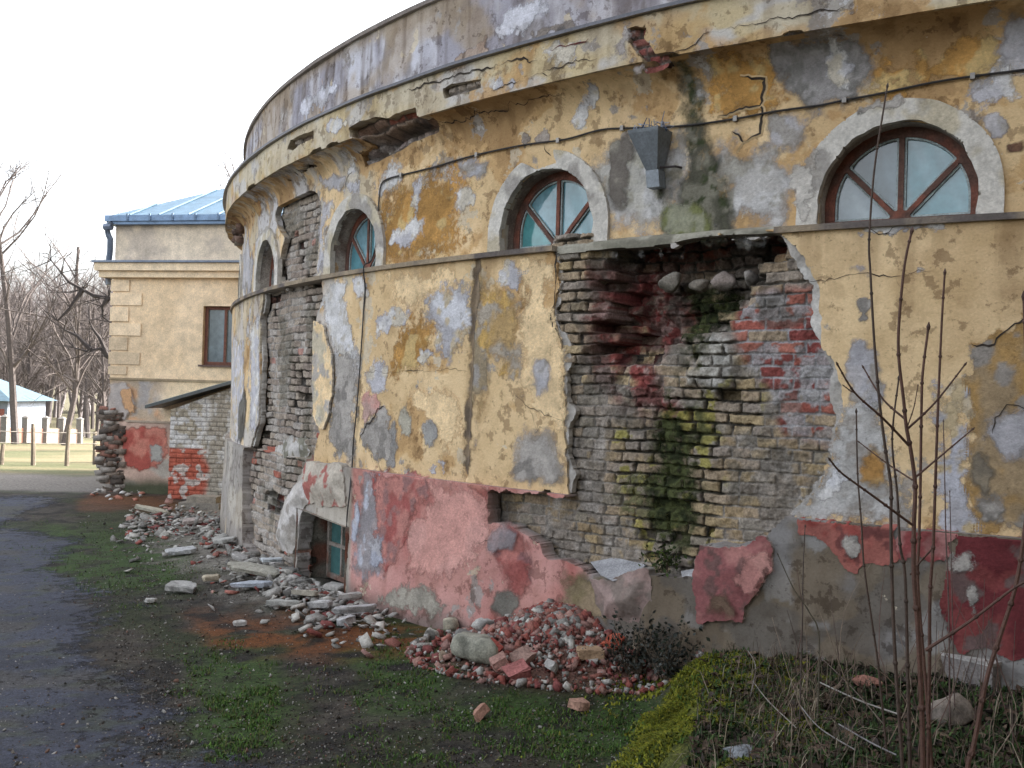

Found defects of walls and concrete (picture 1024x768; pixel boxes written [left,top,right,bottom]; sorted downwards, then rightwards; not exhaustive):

spalling [300,81,440,249]
crack [407,39,596,124]
spalling [616,25,671,74]
leakage [592,61,805,244]
crack [717,74,768,153]
crack [806,269,923,288]
peeling [417,280,472,365]
crack [971,319,1023,347]
spalling [231,192,432,577]
spalling [90,388,169,501]
flaking render [421,419,438,448]
spalling [498,233,1024,661]